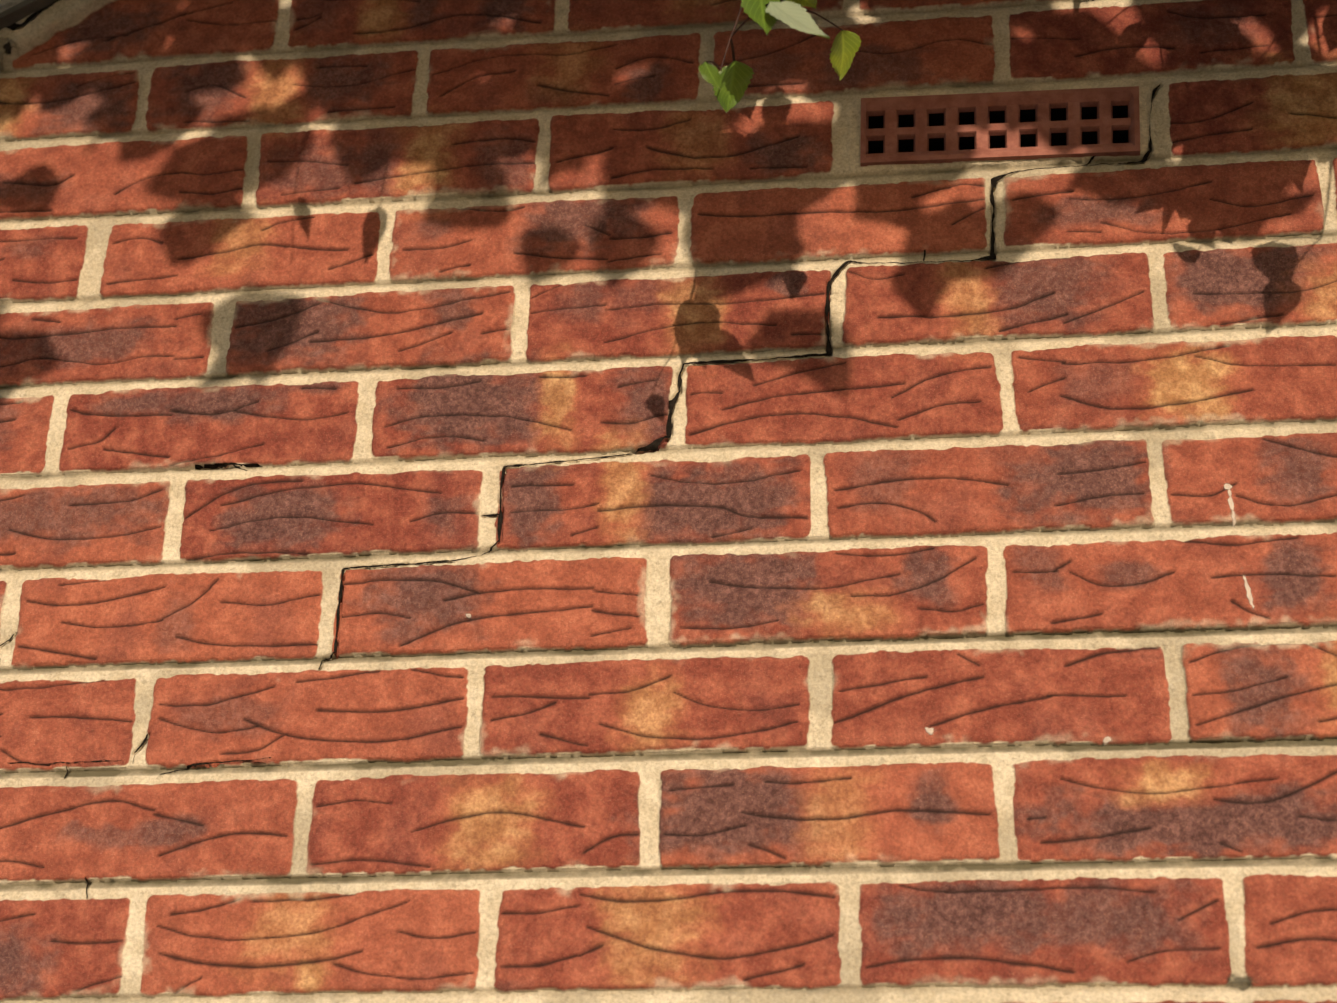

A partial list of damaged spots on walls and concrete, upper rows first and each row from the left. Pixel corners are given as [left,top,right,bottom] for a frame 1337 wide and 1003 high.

crack [318,85,1160,670]